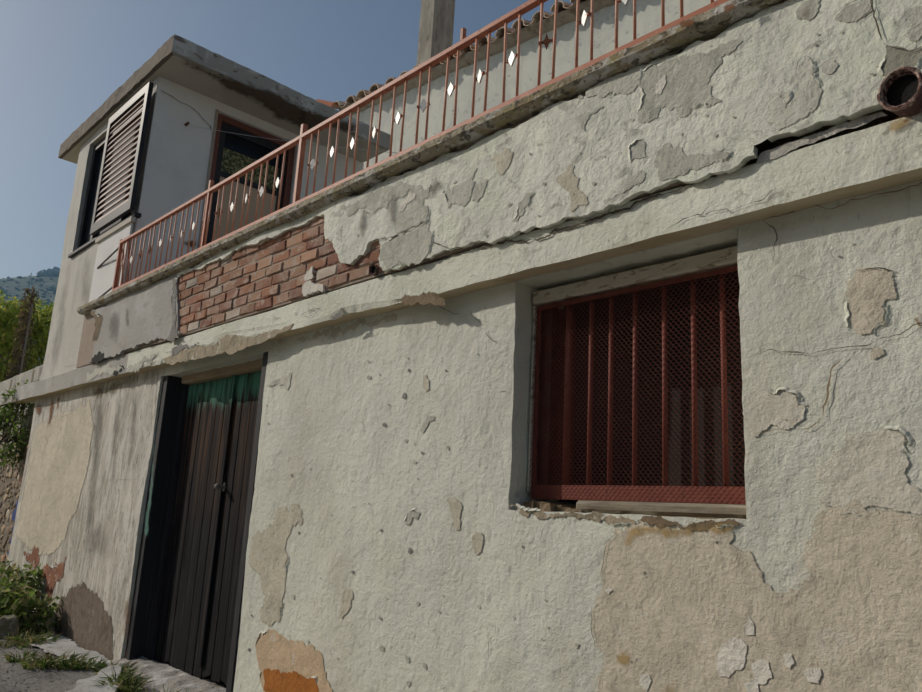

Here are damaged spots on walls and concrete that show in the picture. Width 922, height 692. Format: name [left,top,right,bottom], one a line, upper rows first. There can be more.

flaking render [86,168,488,382]
peeling [508,164,588,221]
peeling [742,387,808,437]
crack [749,313,922,429]
peeling [844,267,902,337]
peeling [16,400,115,660]
peeling [248,504,332,692]
peeling [510,425,922,692]